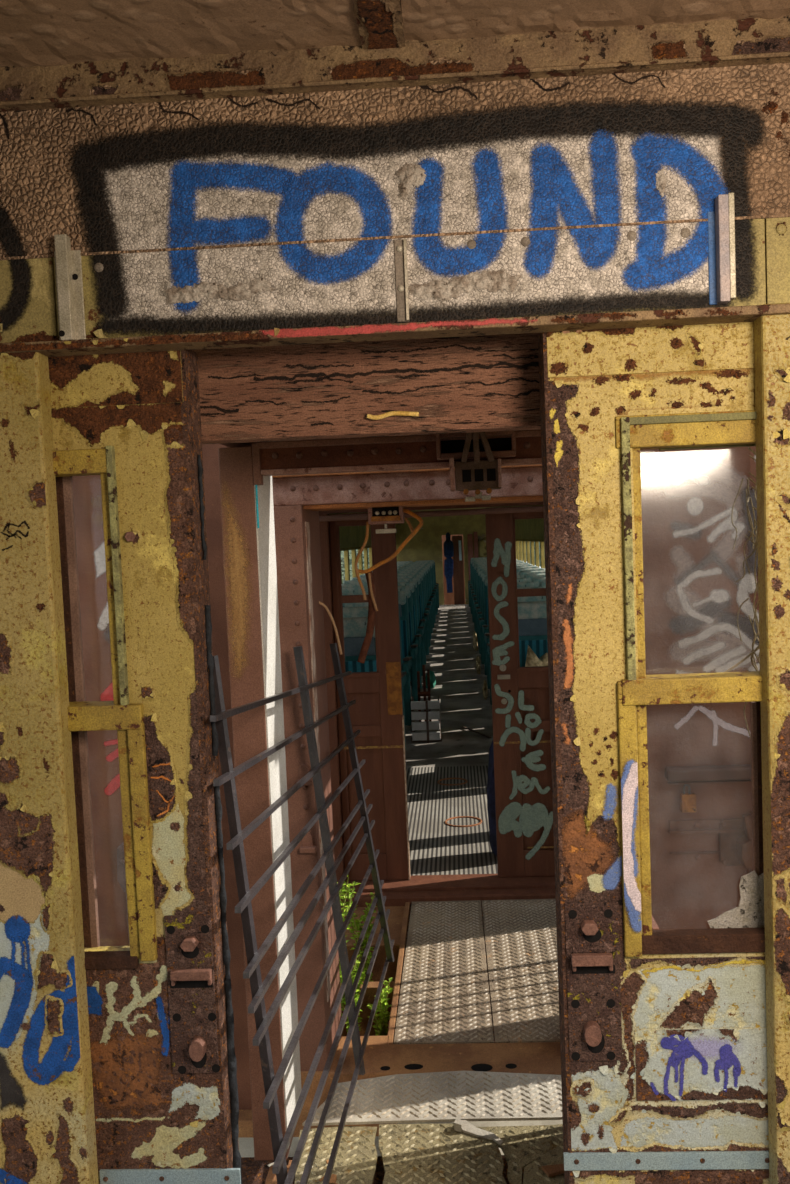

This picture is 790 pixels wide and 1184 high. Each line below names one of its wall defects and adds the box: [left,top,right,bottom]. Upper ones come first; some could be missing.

rust [0,319,262,645]
rust [0,630,15,678]
rust [0,722,57,933]
peeling [152,803,191,916]
rust [141,680,208,915]
rust [547,308,790,1184]
peeling [0,862,50,1048]
rust [0,934,222,1184]
peeling [92,965,167,1045]
peeling [96,1083,220,1169]
peeling [571,1065,769,1152]
peeling [632,959,768,1100]